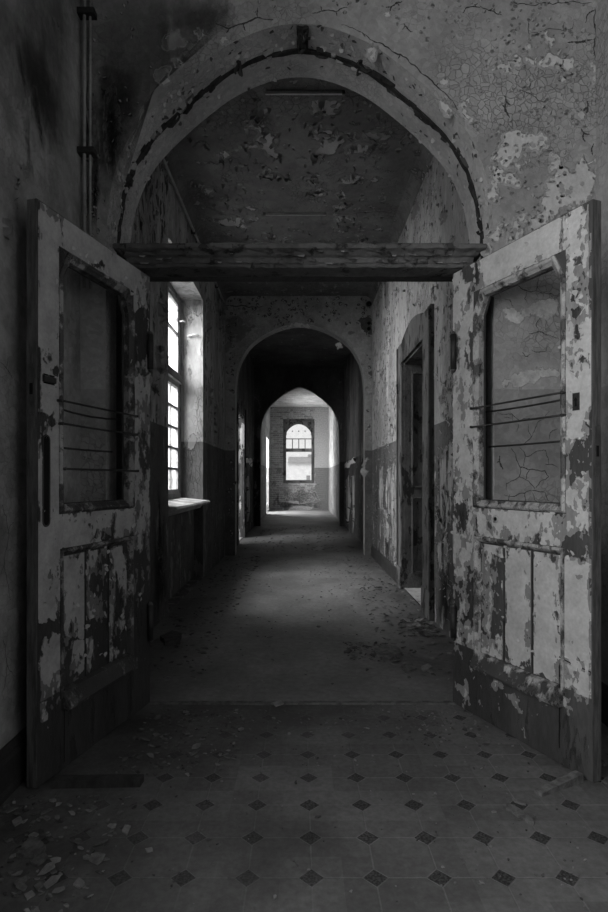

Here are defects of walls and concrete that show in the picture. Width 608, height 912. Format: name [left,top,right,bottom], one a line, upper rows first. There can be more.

water stain [88,75,131,210]
peeling [110,26,251,210]
peeling [308,25,425,96]
crack [313,7,467,119]
peeling [389,76,477,177]
crack [502,90,545,118]
crack [463,1,596,55]
peeling [464,128,596,257]
crack [578,101,594,155]
peeling [502,297,560,325]
peeling [435,440,459,573]
crack [497,411,557,501]